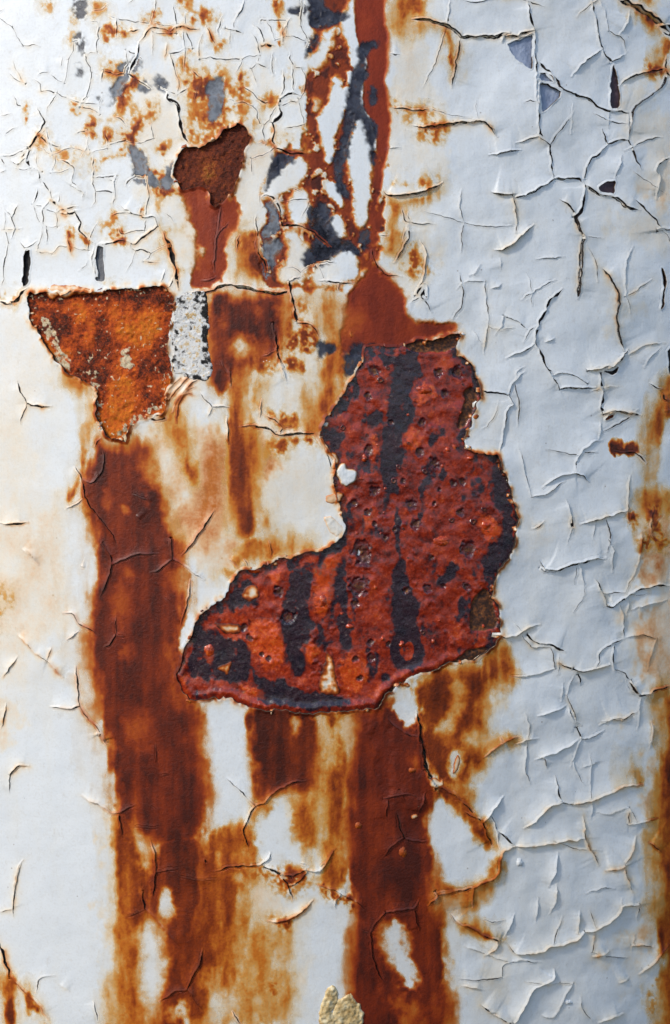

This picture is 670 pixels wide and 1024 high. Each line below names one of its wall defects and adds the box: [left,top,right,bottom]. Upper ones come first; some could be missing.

peeling [20,243,177,445]
corrosion [92,1,130,43]
corrosion [70,60,159,162]
crack [0,0,355,384]
peeling [129,120,255,211]
corrosion [143,0,458,578]
crack [0,437,216,746]
corrosion [62,374,520,1024]
peeling [173,330,522,718]
crack [360,0,670,1024]
crack [0,940,100,1022]
crack [80,794,366,949]